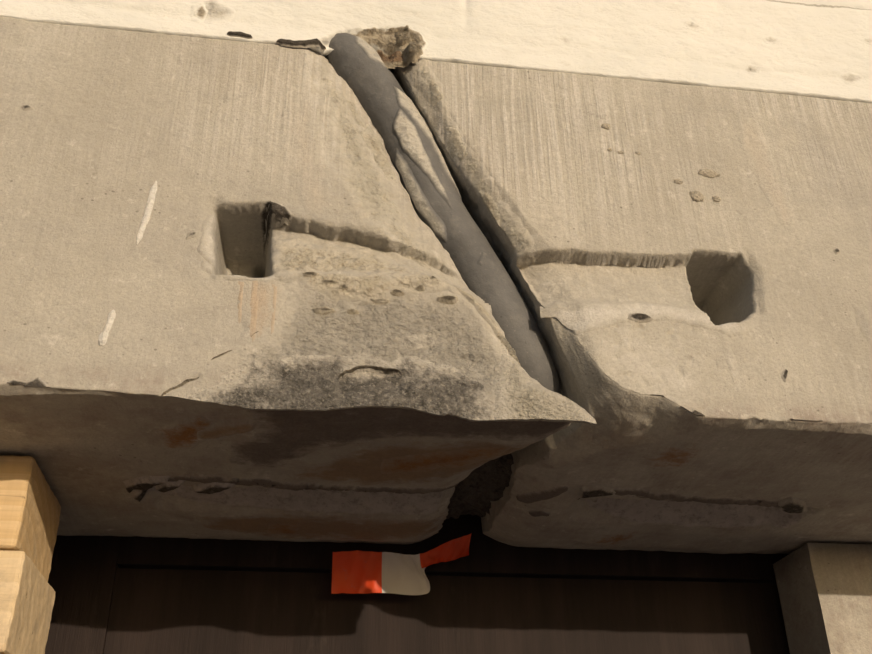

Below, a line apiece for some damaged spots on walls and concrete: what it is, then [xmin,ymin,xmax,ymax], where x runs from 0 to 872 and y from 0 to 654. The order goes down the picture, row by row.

spalling [348,25,539,270]
spalling [147,49,521,421]
crack [168,475,458,494]
water stain [226,407,570,487]
crack [516,486,569,517]
crack [614,488,781,508]